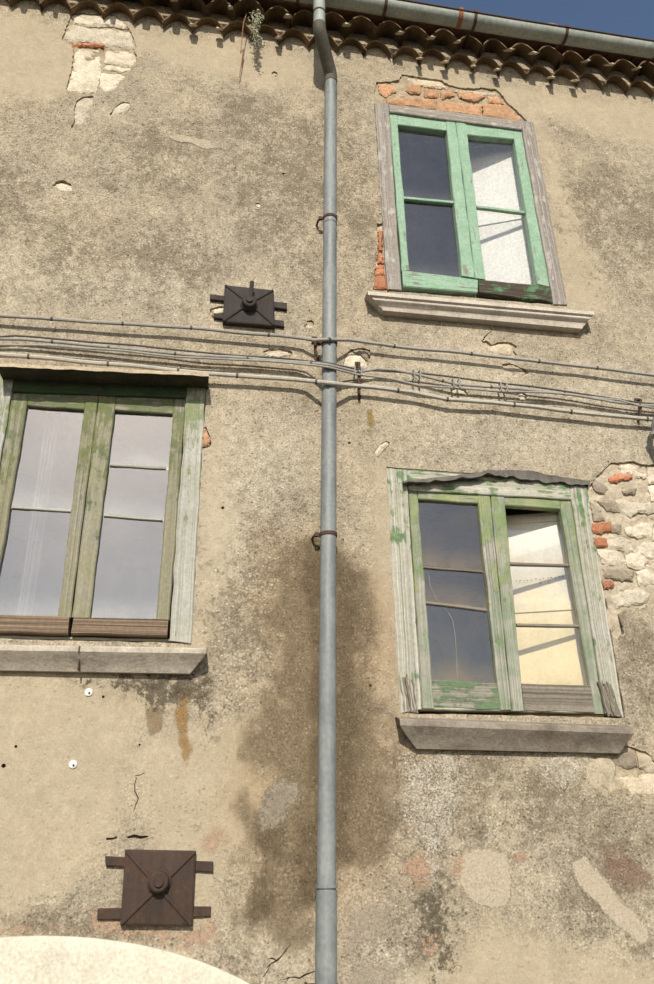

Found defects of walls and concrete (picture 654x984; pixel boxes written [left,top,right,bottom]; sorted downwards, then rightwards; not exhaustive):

flaking render [62,14,137,128]
flaking render [374,76,524,121]
flaking render [587,462,654,640]
leakage [146,708,162,734]
leakage [237,538,320,950]
leakage [336,555,469,891]
flaking render [586,746,654,797]
crack [106,833,148,841]